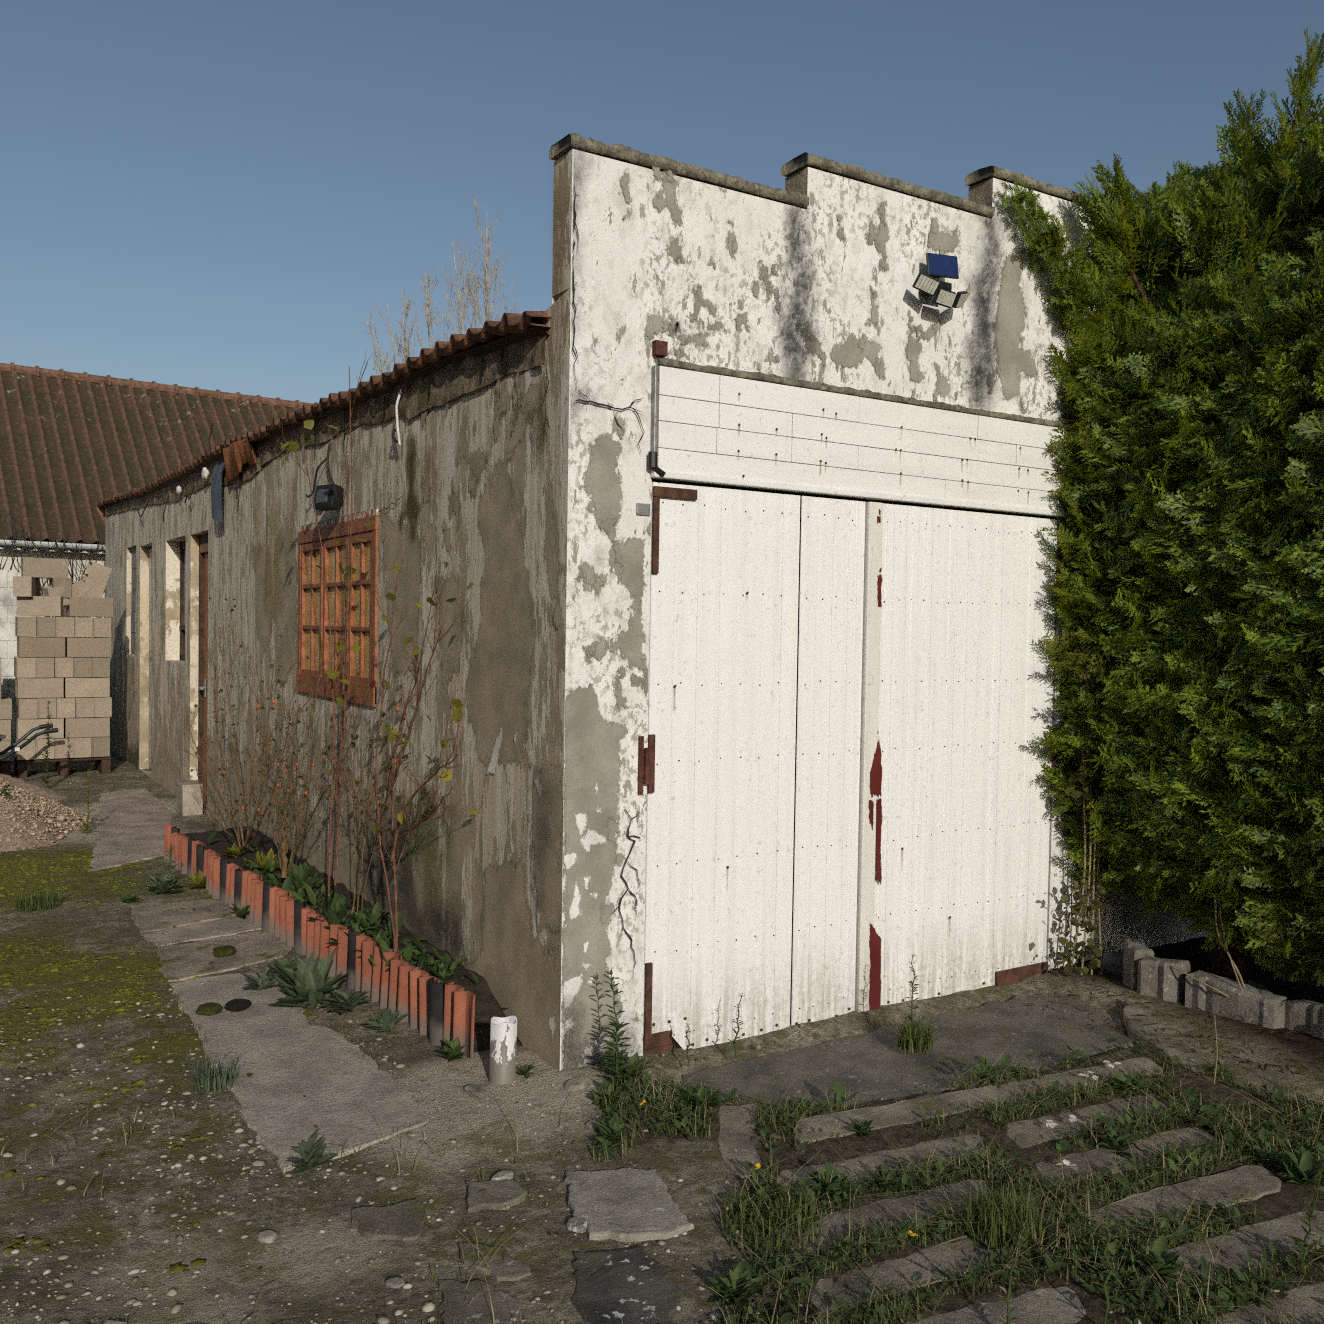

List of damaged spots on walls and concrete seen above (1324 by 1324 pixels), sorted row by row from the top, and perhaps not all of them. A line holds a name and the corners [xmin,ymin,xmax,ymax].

peeling [620,168,632,223]
peeling [652,166,687,269]
peeling [708,220,738,270]
peeling [837,214,847,246]
peeling [865,201,890,272]
peeling [644,260,782,359]
water stain [787,259,812,380]
peeling [796,285,886,379]
peeling [902,310,958,402]
water stain [971,223,998,408]
peeling [106,331,651,1071]
crack [612,809,640,982]